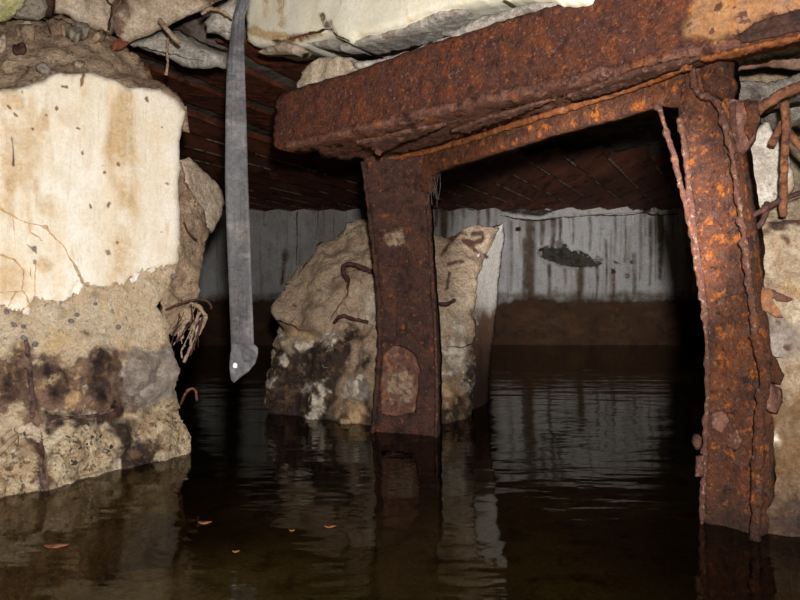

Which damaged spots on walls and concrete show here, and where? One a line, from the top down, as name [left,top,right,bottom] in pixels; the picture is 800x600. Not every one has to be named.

rust [249,0,321,43]
spalling [753,81,800,229]
spalling [537,239,603,268]
damp [493,213,705,352]
spalling [0,264,202,600]
damp [0,297,231,477]
damp [252,296,372,433]